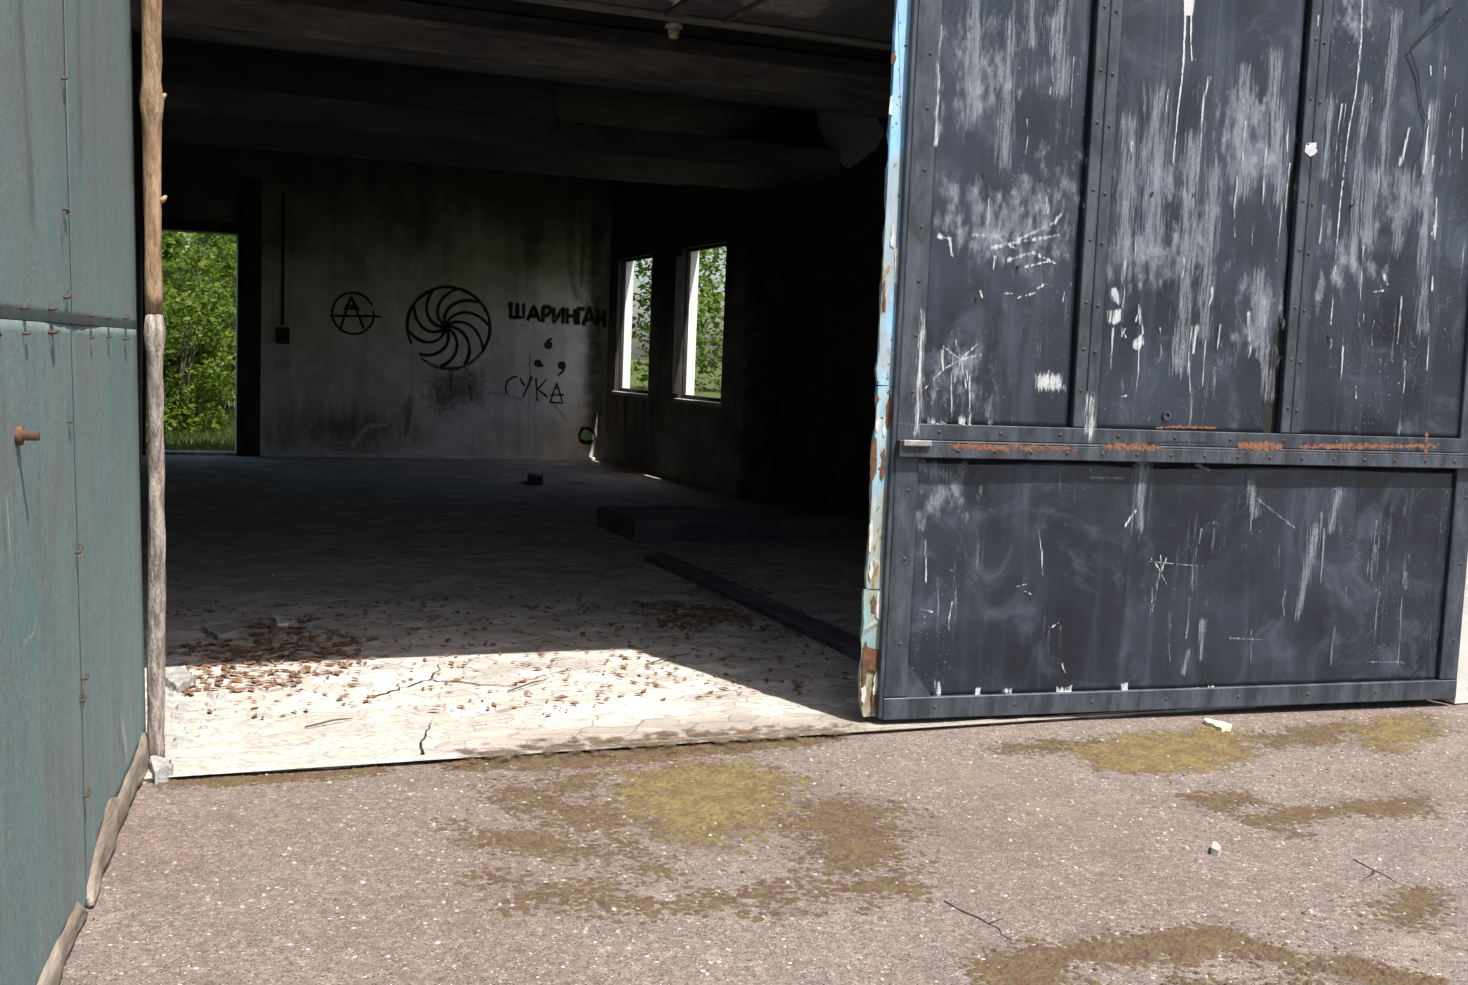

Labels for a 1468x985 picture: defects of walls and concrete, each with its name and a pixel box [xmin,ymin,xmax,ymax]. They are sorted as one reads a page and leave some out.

peeling [890,224,899,284]
corrosion [870,394,891,480]
peeling [876,413,886,437]
corrosion [950,442,1077,453]
corrosion [1102,425,1217,451]
corrosion [1237,432,1439,457]
peeling [869,519,882,619]
peeling [861,671,878,703]
corrosion [862,641,879,712]